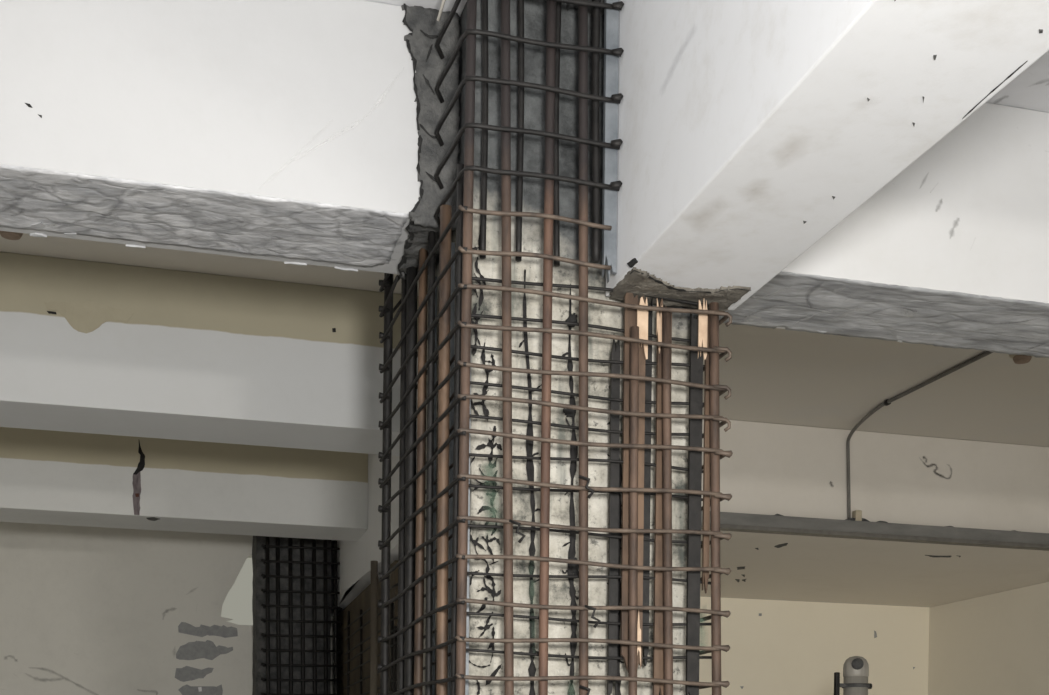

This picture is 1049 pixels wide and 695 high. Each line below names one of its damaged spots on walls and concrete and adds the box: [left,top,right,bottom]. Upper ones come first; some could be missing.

crack [962,61,1027,119]
peeling [175,622,238,695]
crack [469,235,579,695]
crack [607,422,625,695]